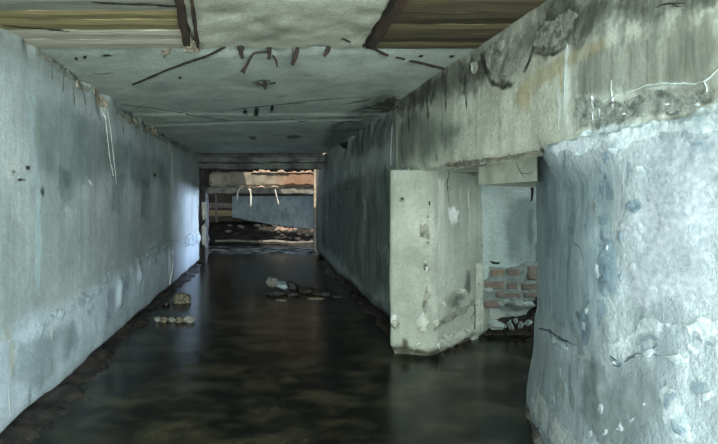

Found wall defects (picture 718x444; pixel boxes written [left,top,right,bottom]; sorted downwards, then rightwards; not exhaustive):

spalling [37,48,108,108]
water stain [398,52,486,128]
flaking render [470,10,577,90]
water stain [101,110,117,184]
flaking render [445,90,718,347]
flaking render [415,260,537,351]
crack [538,328,572,351]
spalling [610,349,654,369]
flaking render [667,345,699,364]
flaking render [659,387,694,441]